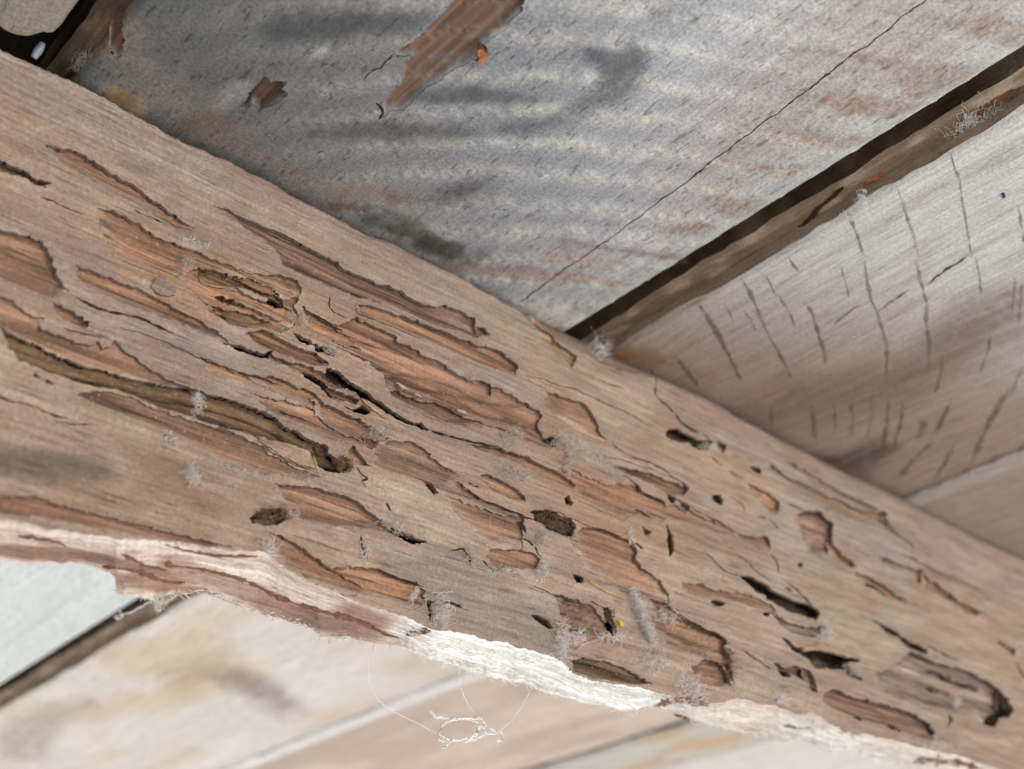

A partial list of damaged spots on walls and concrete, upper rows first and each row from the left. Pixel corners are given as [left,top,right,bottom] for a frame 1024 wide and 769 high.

peeling [375,0,524,117]
peeling [241,77,288,113]
crack [521,0,927,302]
peeling [232,287,284,322]
crack [835,255,968,324]
peeling [360,398,389,419]
peeling [258,440,316,469]
peeling [799,644,860,658]